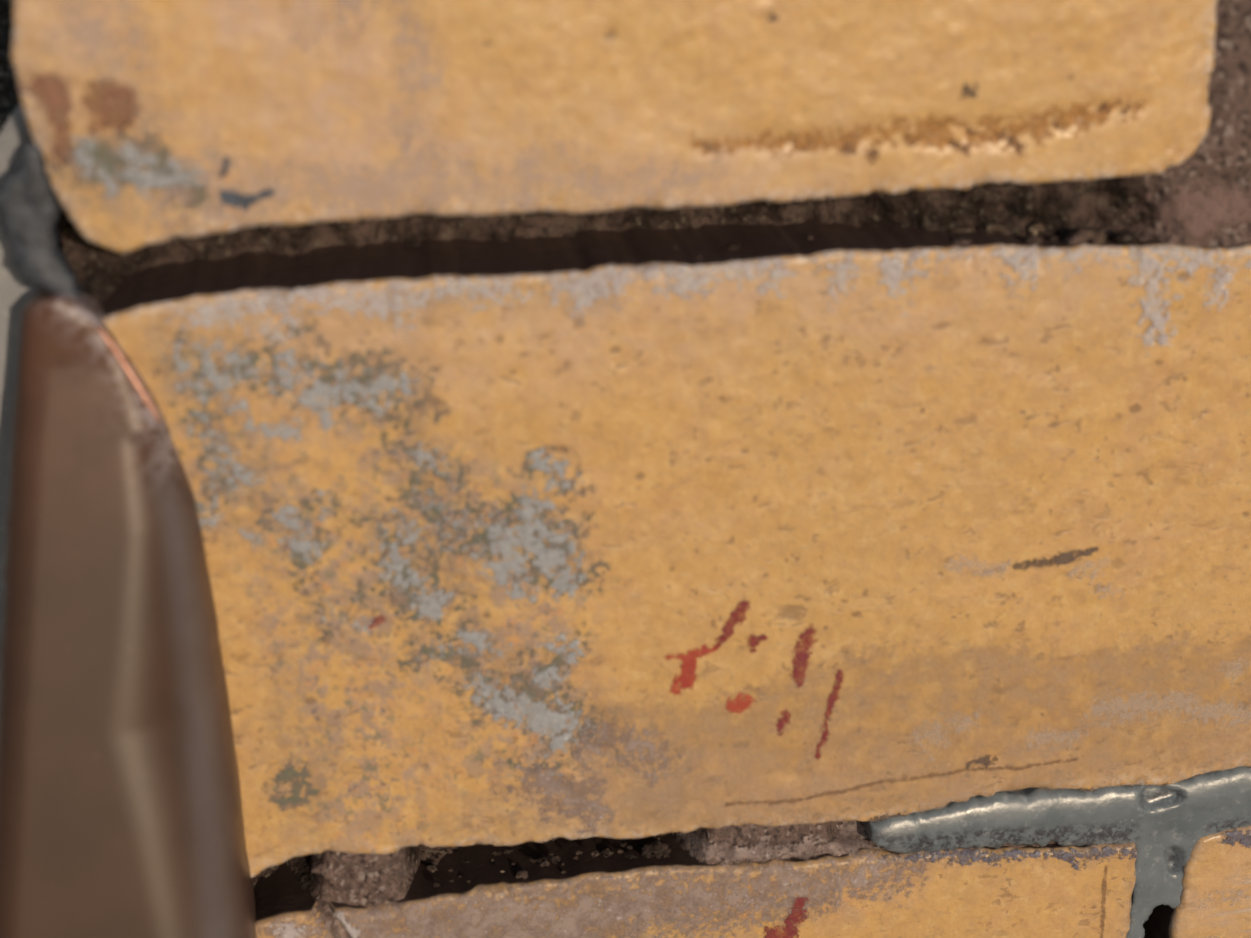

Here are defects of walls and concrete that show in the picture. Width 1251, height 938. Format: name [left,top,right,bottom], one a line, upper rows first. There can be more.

peeling [216,156,275,211]
peeling [154,311,610,784]